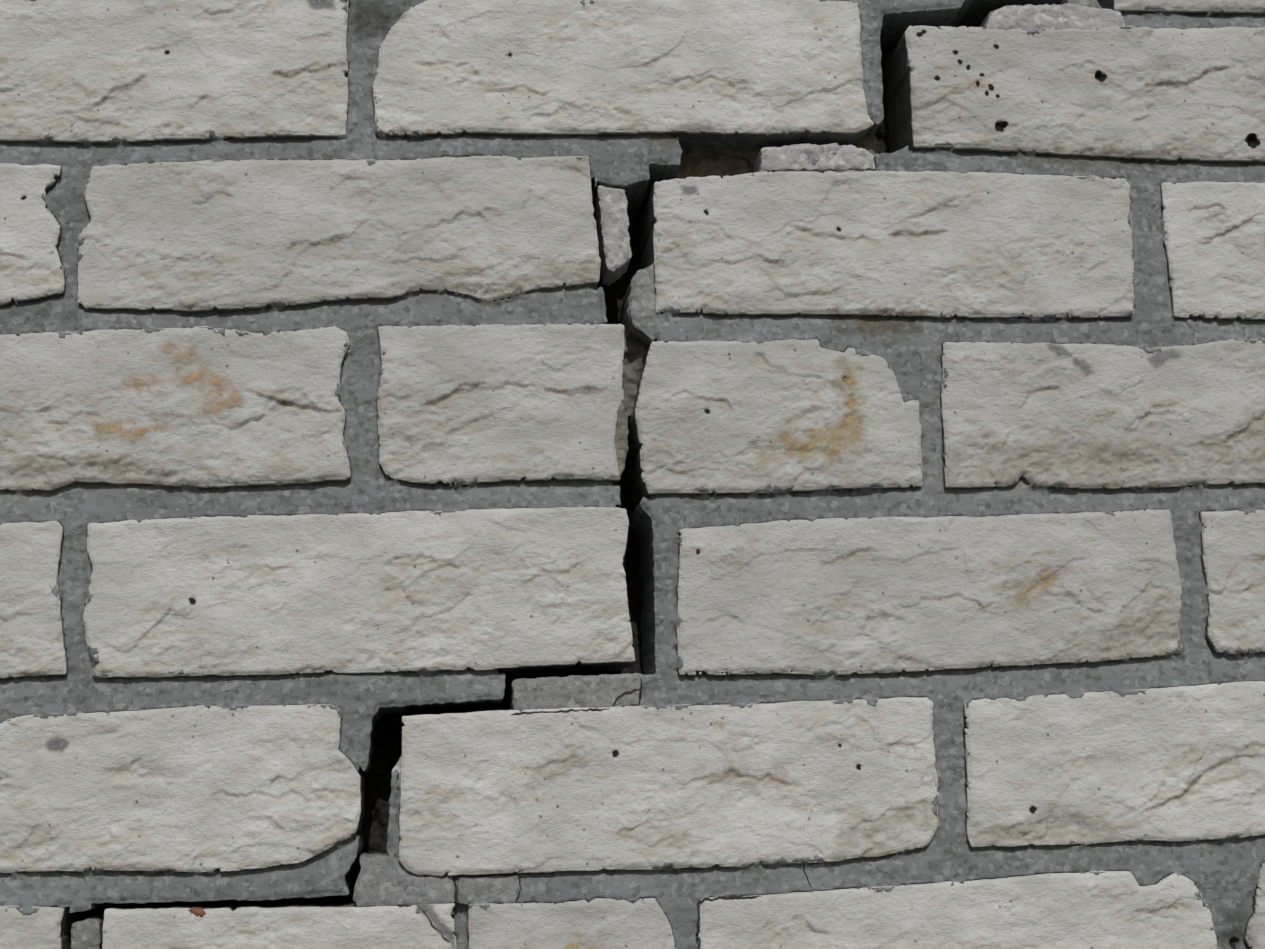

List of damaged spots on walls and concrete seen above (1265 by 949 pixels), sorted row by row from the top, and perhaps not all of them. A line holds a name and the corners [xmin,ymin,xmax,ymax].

crack [1050,0,1063,8]
crack [674,48,895,179]
crack [597,203,648,421]
crack [85,459,643,919]
crack [421,907,450,942]
crack [696,895,763,949]